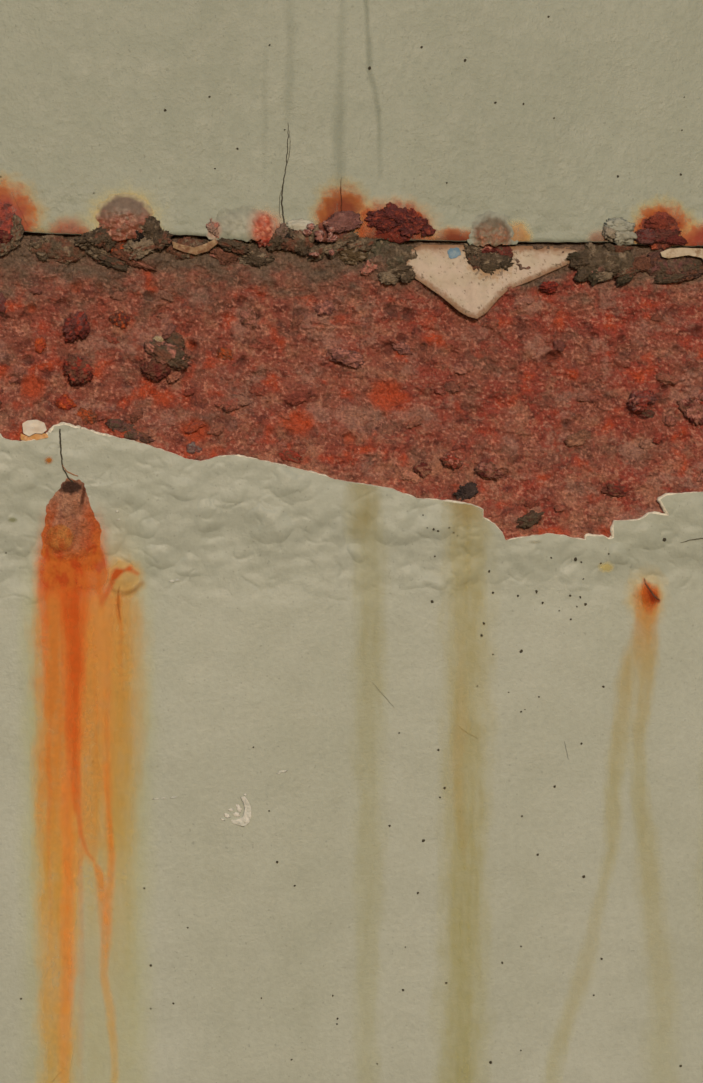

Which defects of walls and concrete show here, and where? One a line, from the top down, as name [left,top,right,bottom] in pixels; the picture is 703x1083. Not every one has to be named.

peeling [172,239,218,255]
peeling [661,248,703,259]
peeling [406,244,577,319]
corrosion [0,181,703,540]
peeling [21,420,48,441]
corrosion [631,575,664,611]
corrosion [36,478,141,1083]